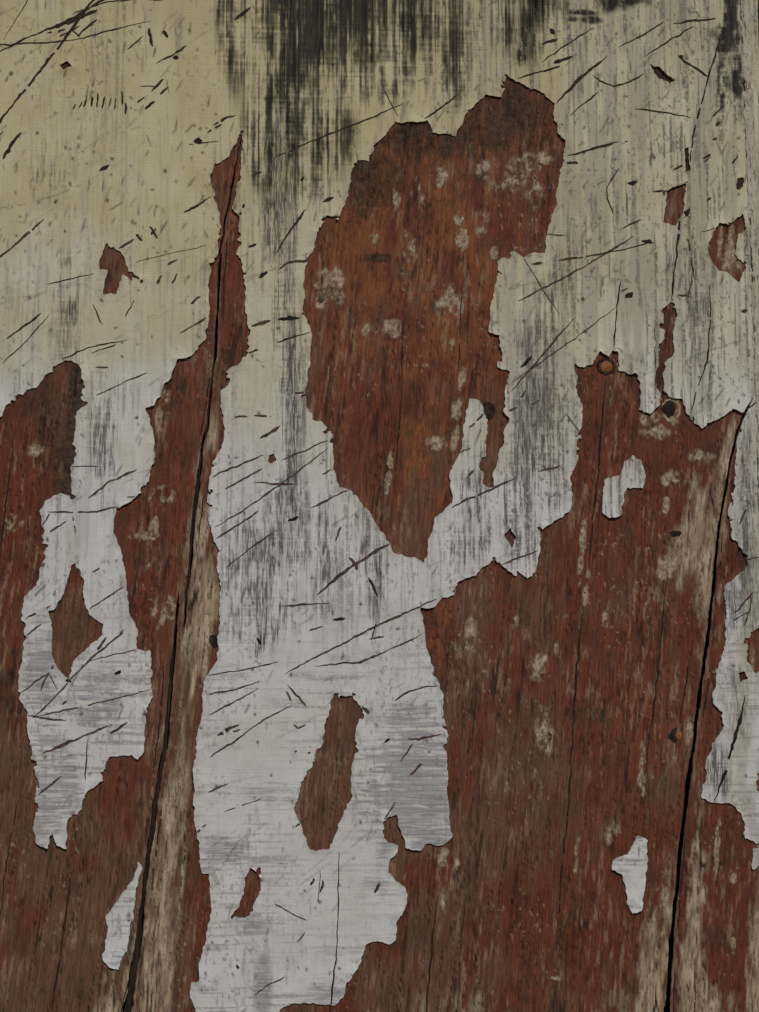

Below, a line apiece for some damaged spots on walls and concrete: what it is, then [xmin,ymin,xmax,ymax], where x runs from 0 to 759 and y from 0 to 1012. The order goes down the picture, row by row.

peeling [301,75,565,563]
peeling [663,184,686,226]
peeling [708,215,747,282]
crack [0,437,14,545]
peeling [0,130,251,1012]
crack [121,131,243,1012]
peeling [279,302,759,1012]
crack [644,586,666,778]
crack [664,402,756,1012]
crack [0,800,18,915]
crack [33,872,72,1012]
peeling [231,867,261,919]